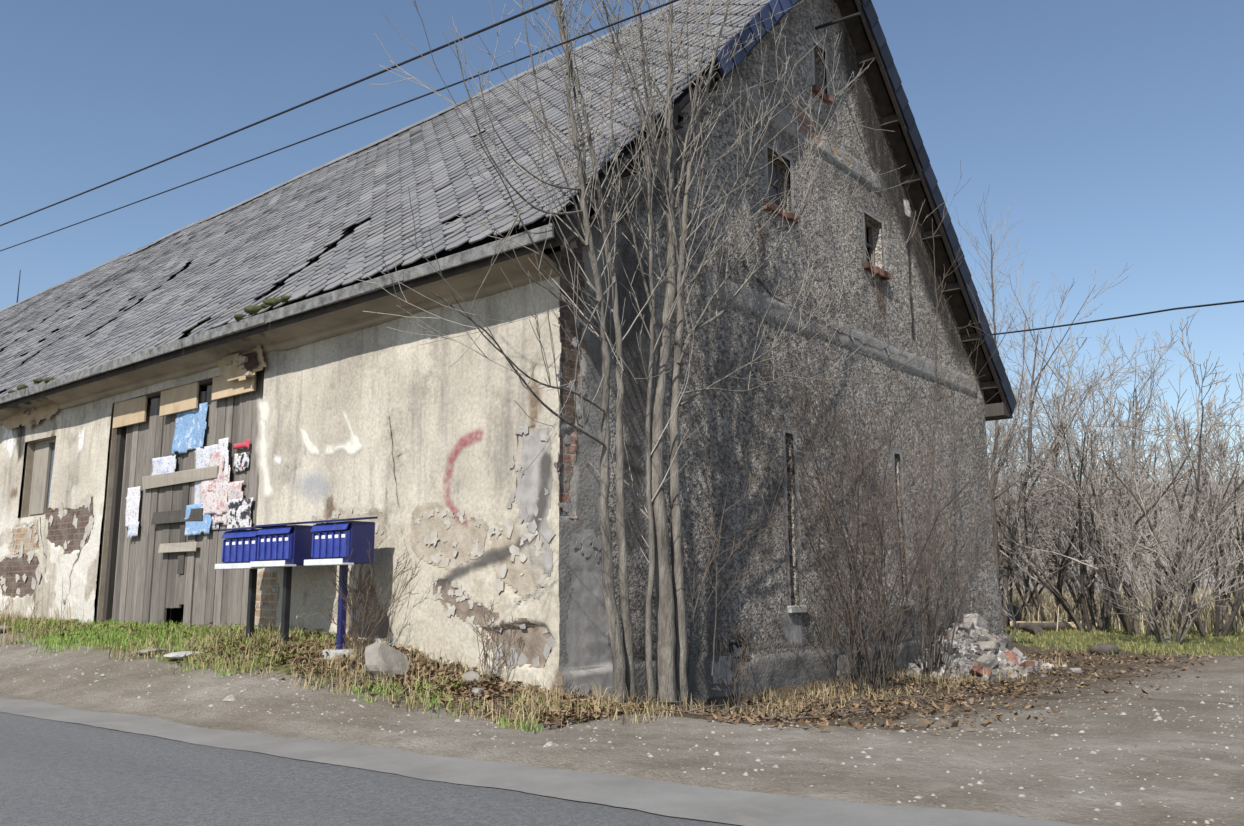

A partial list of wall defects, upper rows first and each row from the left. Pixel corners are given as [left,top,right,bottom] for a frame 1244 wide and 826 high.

crack [743,264,904,356]
flaking render [0,494,94,597]
flaking render [311,506,387,549]
spalling [336,588,394,645]